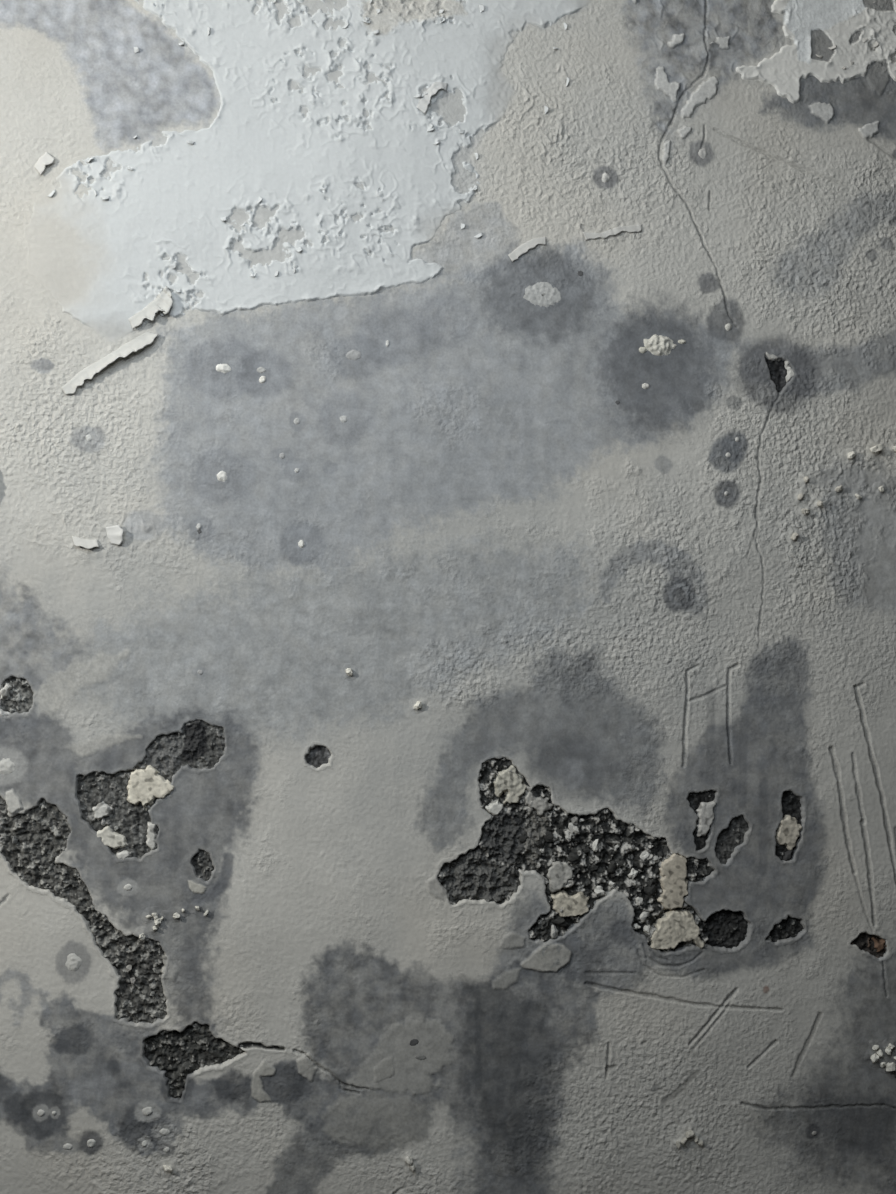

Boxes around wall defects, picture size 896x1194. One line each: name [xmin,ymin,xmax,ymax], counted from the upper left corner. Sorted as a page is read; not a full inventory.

water stain [0,0,221,160]
peeling [24,0,592,395]
crack [657,0,739,329]
water stain [607,0,896,169]
peeling [736,0,896,104]
water stain [120,180,896,569]
crack [745,394,782,650]
spalling [0,673,37,720]
crack [0,893,11,907]
spalling [0,716,250,1104]
water stain [0,516,832,1194]
spalling [435,754,809,957]